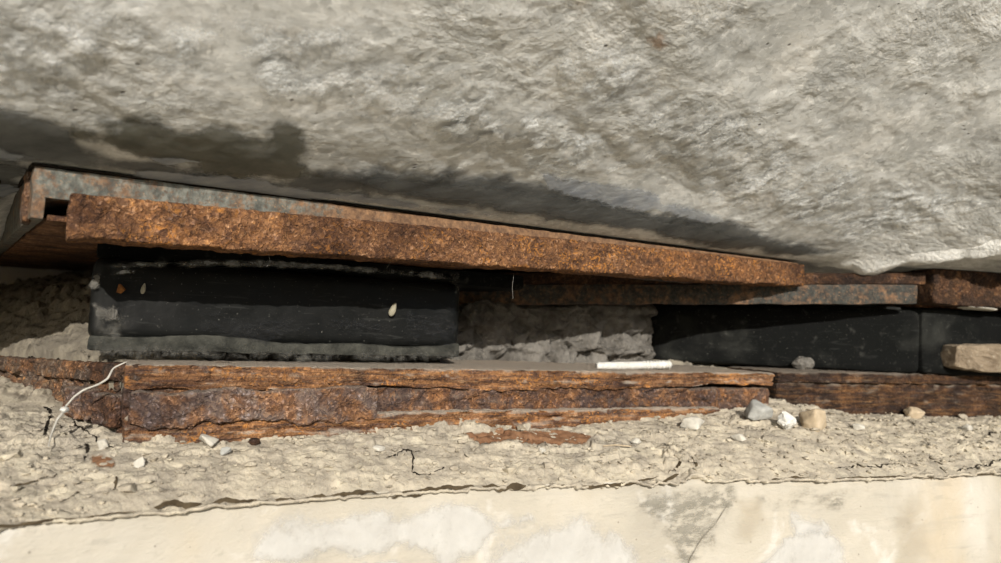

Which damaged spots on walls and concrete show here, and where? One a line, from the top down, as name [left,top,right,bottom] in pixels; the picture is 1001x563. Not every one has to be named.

damp [0,108,826,256]
corrosion [465,427,591,445]